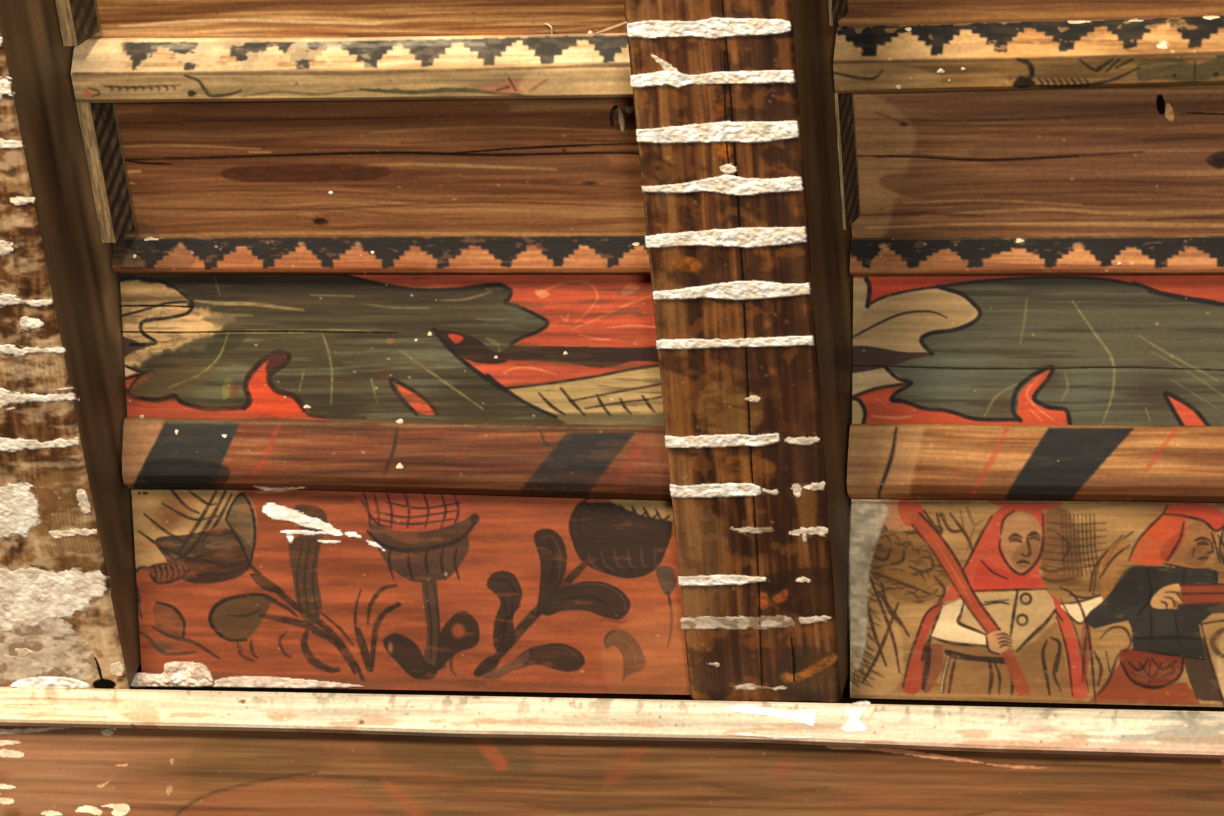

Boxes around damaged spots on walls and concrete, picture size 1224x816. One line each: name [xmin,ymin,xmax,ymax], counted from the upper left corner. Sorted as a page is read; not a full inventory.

peeling [0,727,77,758]
peeling [0,784,16,804]
peeling [41,804,130,816]